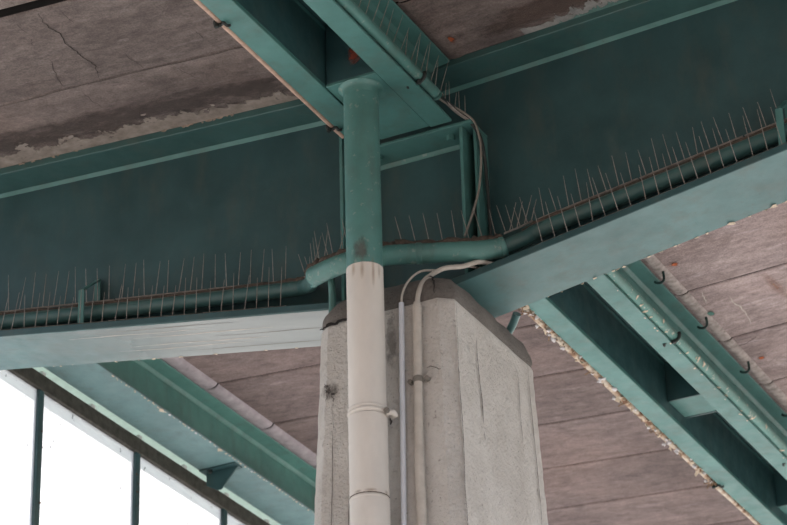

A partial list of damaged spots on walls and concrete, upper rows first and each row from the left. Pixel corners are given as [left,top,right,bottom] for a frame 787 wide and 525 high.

damp [489,0,588,33]
peeling [520,0,630,35]
crack [0,11,243,107]
damp [0,78,277,152]
peeling [0,90,299,168]